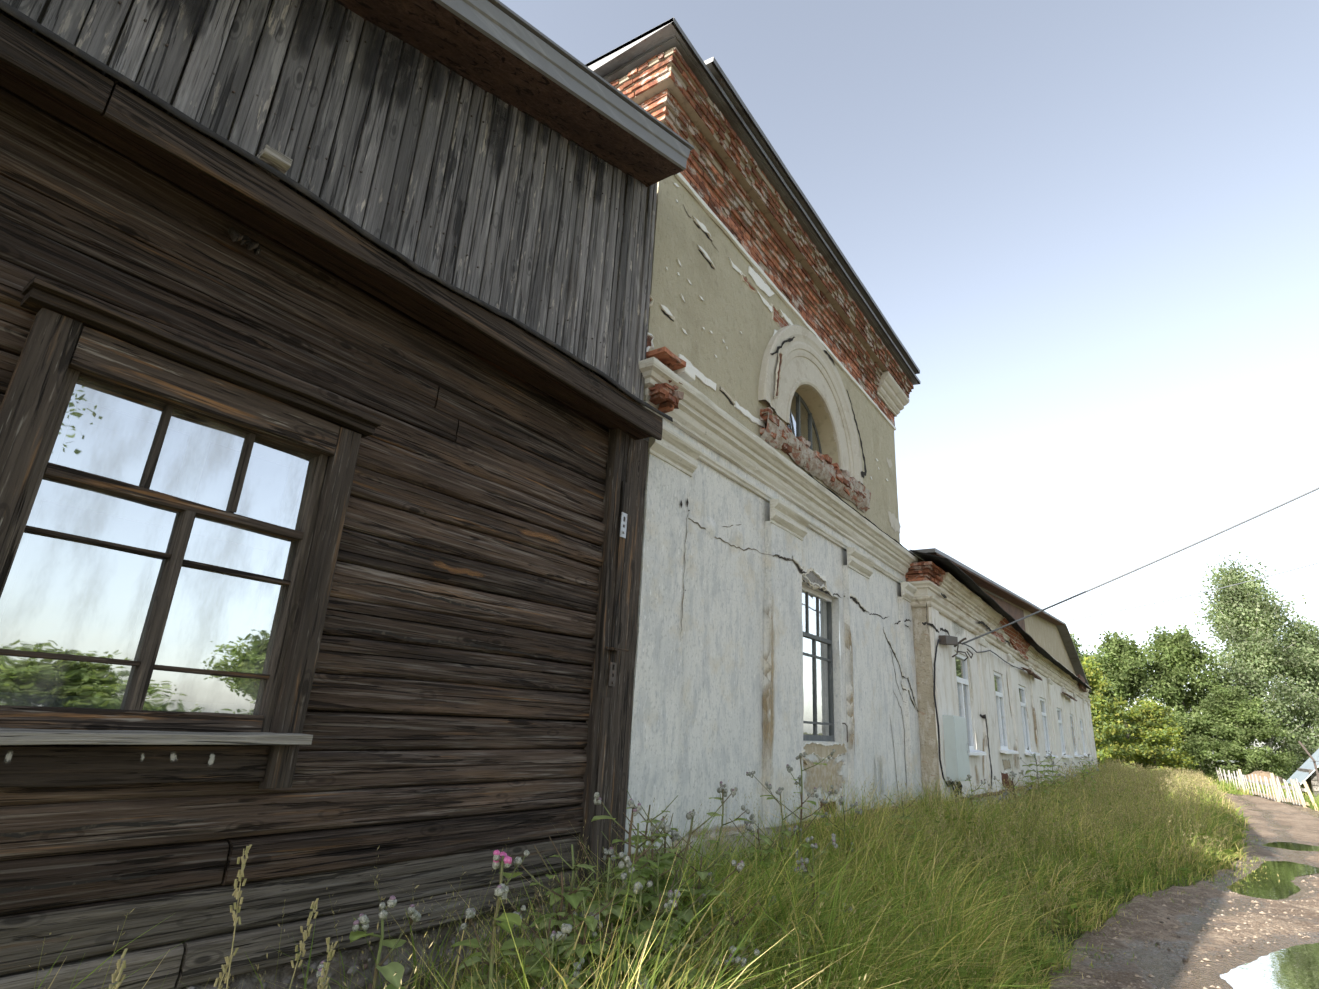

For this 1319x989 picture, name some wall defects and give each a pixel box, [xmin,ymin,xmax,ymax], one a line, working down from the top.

flaking render [692,216,793,336]
peeling [649,295,728,358]
spalling [646,333,716,413]
flaking render [774,351,783,399]
flaking render [734,401,765,428]
crack [680,515,1011,801]
flaking render [801,742,848,815]